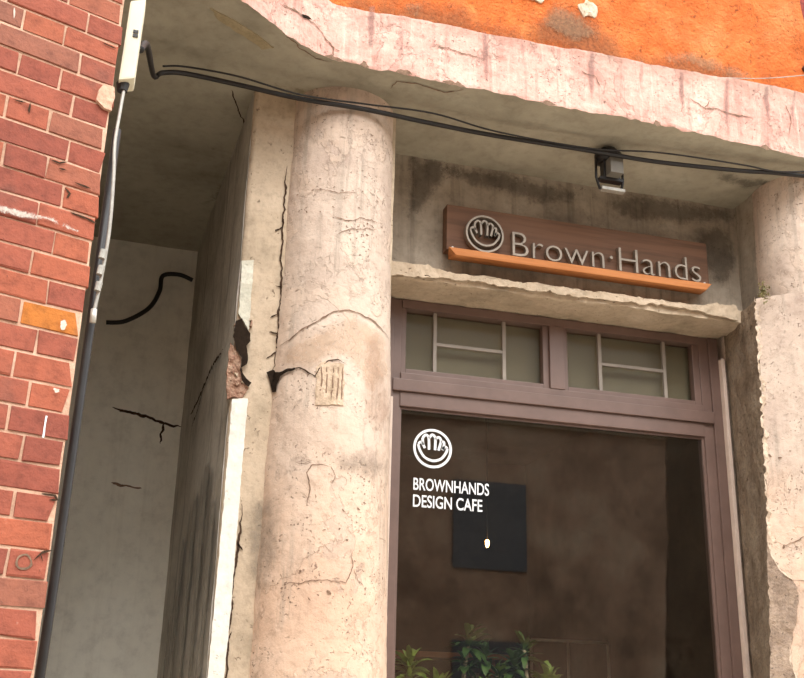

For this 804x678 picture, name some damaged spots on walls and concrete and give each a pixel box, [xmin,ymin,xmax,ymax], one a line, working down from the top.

peeling [577,0,598,18]
water stain [0,206,78,232]
crack [266,169,390,370]
crack [113,349,223,442]
spalling [266,359,347,406]
peeling [207,318,253,678]
spalling [754,298,799,678]